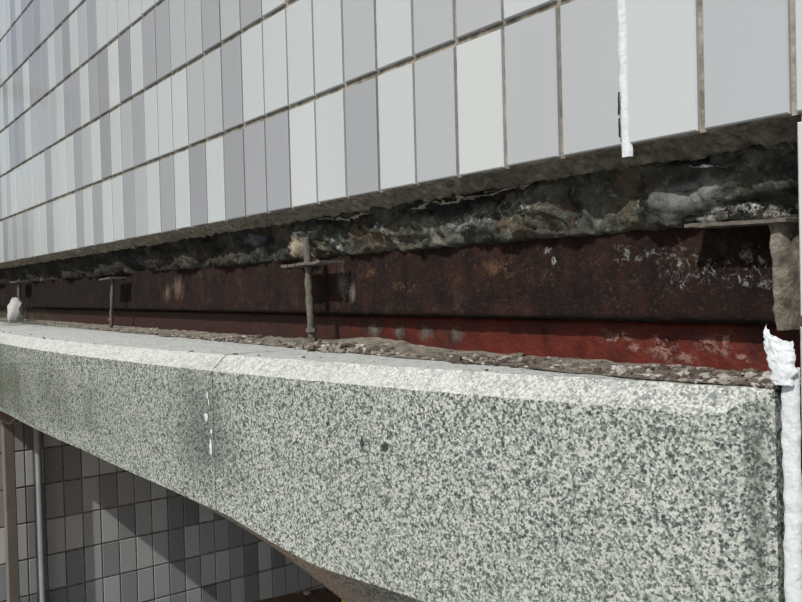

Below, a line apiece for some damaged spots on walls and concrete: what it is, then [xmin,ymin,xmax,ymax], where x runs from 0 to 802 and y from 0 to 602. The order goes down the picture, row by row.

spalling [652,176,722,213]
spalling [288,236,319,261]
water stain [617,247,698,289]
water stain [738,249,767,287]
peeling [604,330,640,352]
peeling [650,337,692,363]
peeling [699,333,749,363]